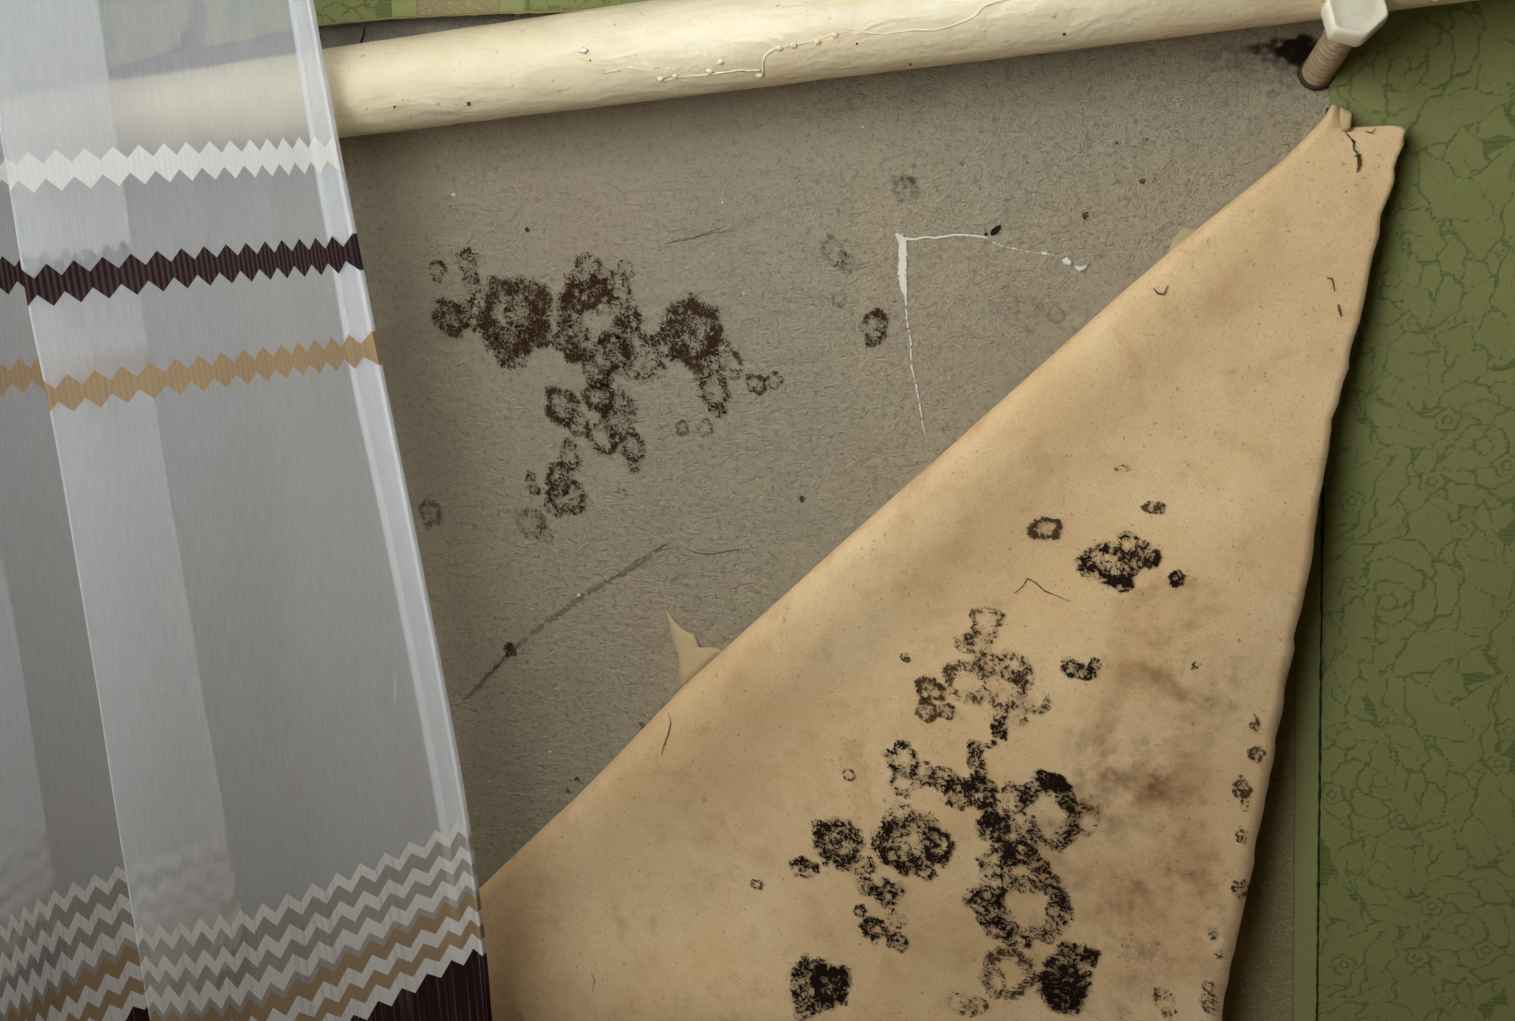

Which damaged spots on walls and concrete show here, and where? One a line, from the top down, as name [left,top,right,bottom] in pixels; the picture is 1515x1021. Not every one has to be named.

mould [429,247,783,543]
leakage [418,500,443,530]
mould [1027,516,1063,541]
leakage [1141,501,1166,514]
mould [1075,531,1186,593]
mould [1247,714,1266,763]
mould [789,607,1103,1020]
mould [1232,775,1253,844]
mould [1230,879,1250,900]
mould [1152,988,1177,1020]
mould [1199,980,1219,1021]